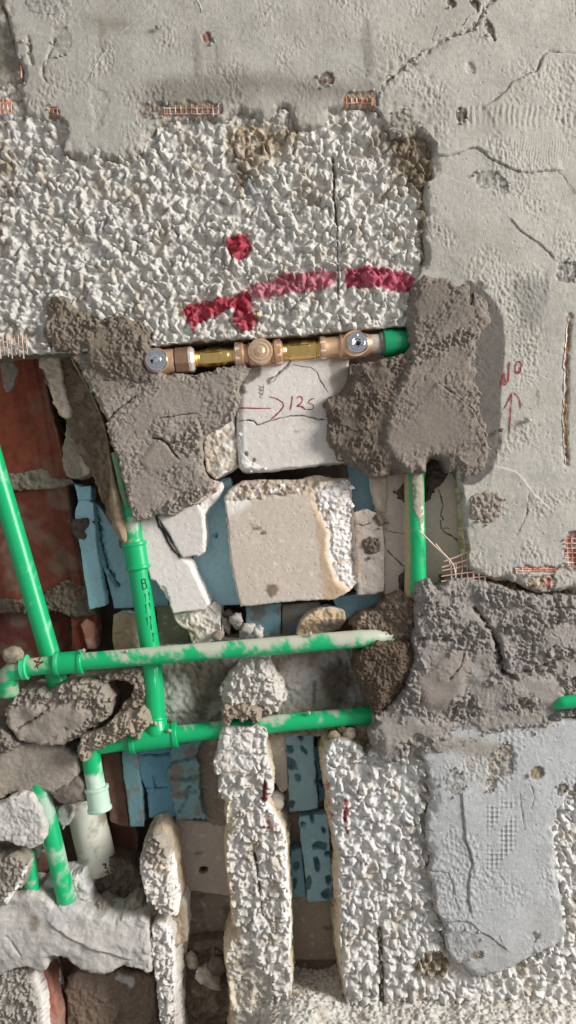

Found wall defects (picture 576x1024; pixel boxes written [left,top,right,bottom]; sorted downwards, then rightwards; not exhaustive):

spalling [138,100,222,124]
spalling [388,107,433,267]
crack [440,147,575,195]
spalling [39,358,93,480]
spalling [562,315,572,464]
spalling [231,407,355,581]
crack [438,489,458,541]
spalling [512,531,576,592]
spalling [526,767,546,779]
spalling [556,783,569,795]
crack [429,801,507,950]
spalling [231,939,269,1015]